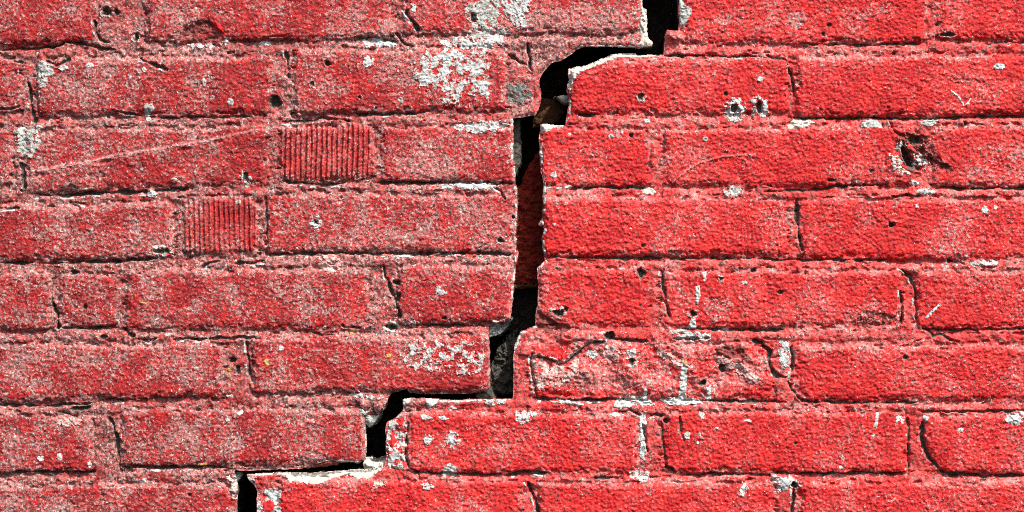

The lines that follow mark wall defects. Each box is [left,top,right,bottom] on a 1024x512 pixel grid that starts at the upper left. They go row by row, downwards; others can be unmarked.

peeling [410,0,533,108]
spalling [888,119,957,209]
crack [226,0,692,512]